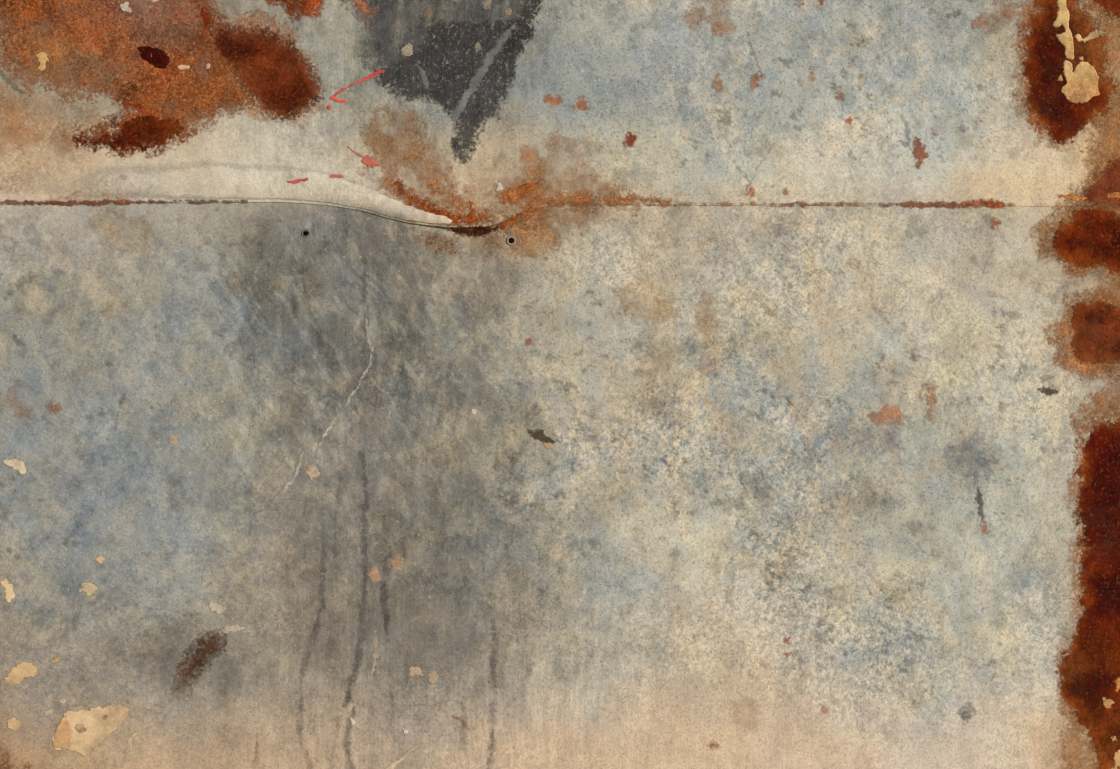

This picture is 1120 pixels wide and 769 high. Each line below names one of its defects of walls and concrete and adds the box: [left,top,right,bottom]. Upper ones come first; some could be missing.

corrosion [0,0,325,157]
corrosion [363,112,672,258]
corrosion [1005,0,1120,769]
peeling [45,698,129,757]